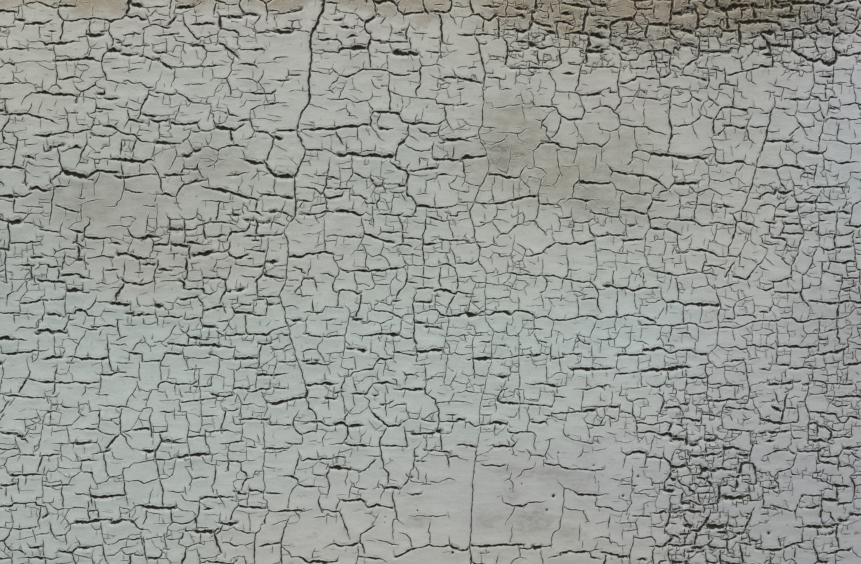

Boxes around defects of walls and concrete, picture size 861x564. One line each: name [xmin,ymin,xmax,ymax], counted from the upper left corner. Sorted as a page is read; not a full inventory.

crack [21,19,58,38]
crack [219,42,240,60]
crack [0,188,56,226]
crack [0,298,48,323]
crack [98,281,159,327]
crack [723,289,756,321]
crack [100,409,134,451]
crack [507,408,538,451]
crack [542,454,607,492]
crack [496,495,546,525]
crack [821,488,840,506]
crack [836,475,861,514]